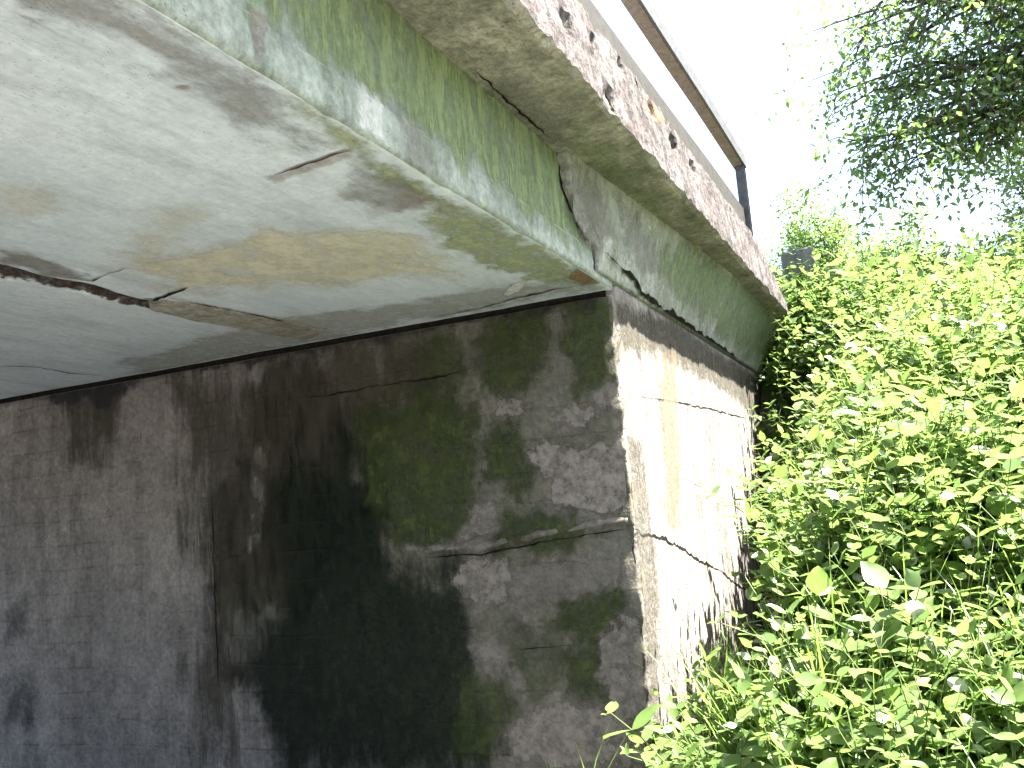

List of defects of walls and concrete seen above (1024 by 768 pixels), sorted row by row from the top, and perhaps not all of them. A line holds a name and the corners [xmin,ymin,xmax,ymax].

crack [477,72,747,365]
damp [139,230,444,295]
crack [440,285,577,316]
corrosion [570,269,600,286]
crack [307,367,474,398]
peeling [495,395,526,418]
crack [638,396,744,418]
peeling [527,381,636,514]
damp [43,284,595,768]
peeling [450,501,502,541]
peeling [451,556,513,606]
crack [429,525,746,590]